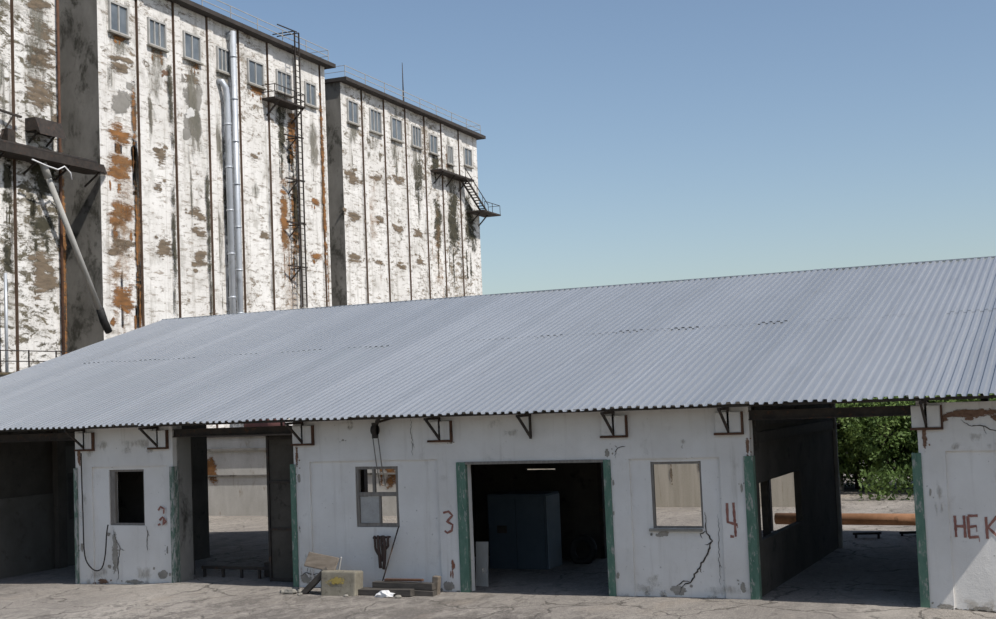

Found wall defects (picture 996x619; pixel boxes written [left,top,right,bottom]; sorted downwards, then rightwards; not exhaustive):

water stain [27,0,44,86]
water stain [148,48,176,160]
water stain [188,61,201,151]
water stain [2,157,14,292]
water stain [30,163,58,252]
rust [107,86,142,329]
water stain [206,127,230,315]
rust [279,108,329,300]
water stain [411,142,477,287]
flaking render [943,408,996,422]
crack [678,515,721,594]